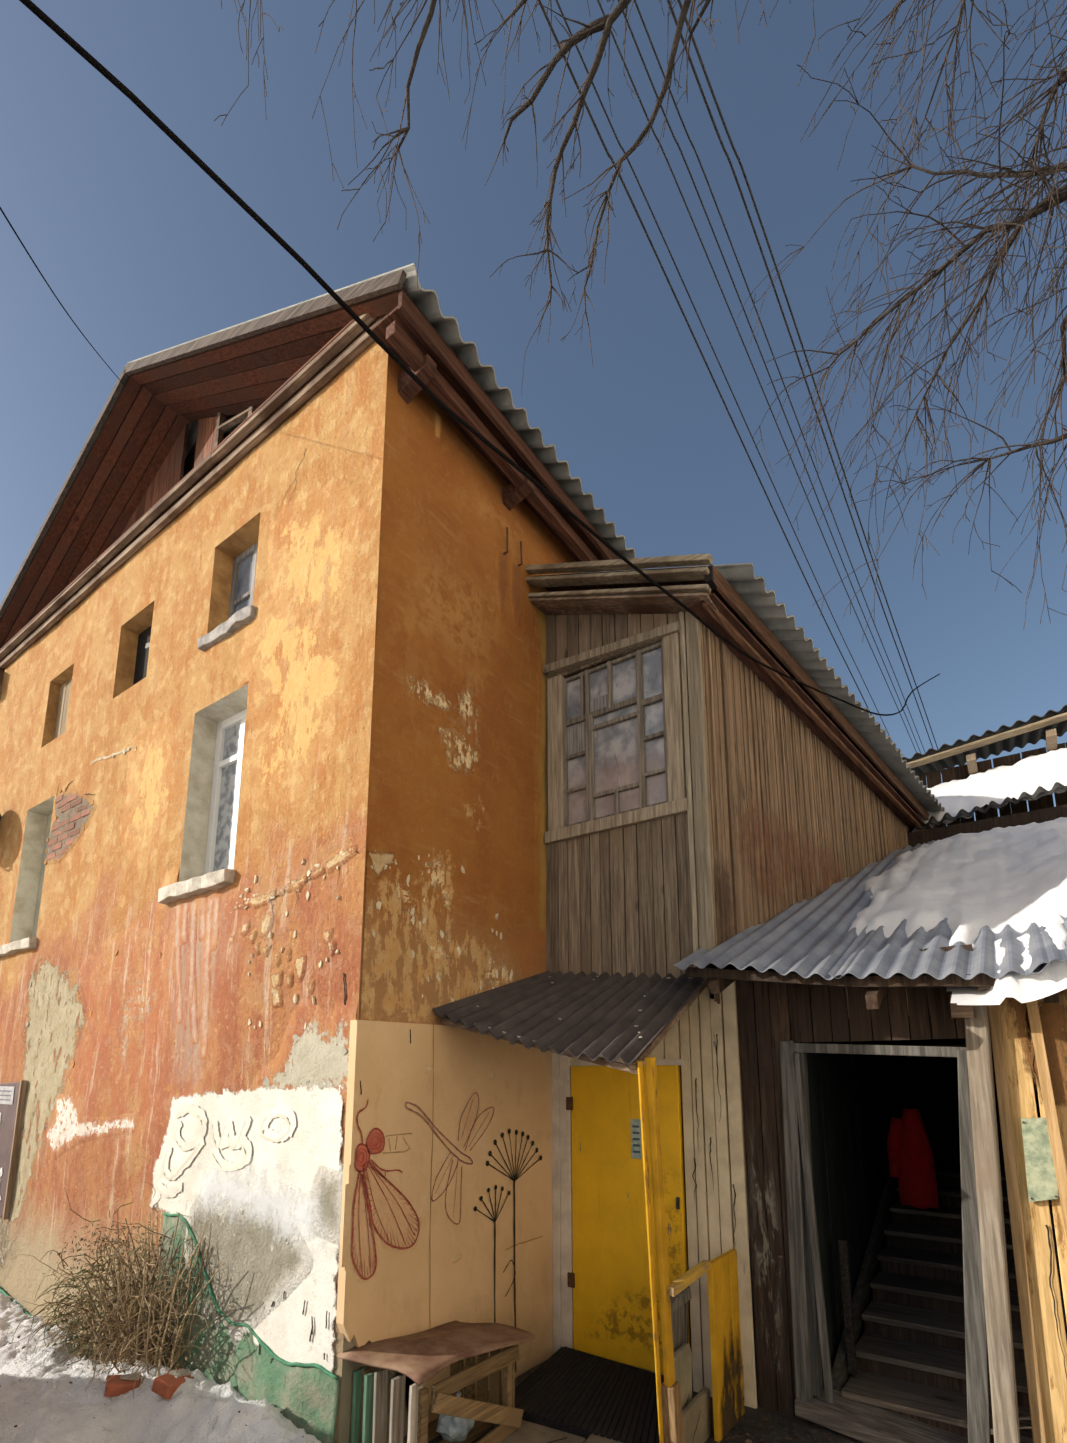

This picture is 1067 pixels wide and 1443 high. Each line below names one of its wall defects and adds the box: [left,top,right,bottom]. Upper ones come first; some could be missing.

flaking render [44,789,97,866]
peeling [228,399,546,1109]
peeling [0,917,175,1287]